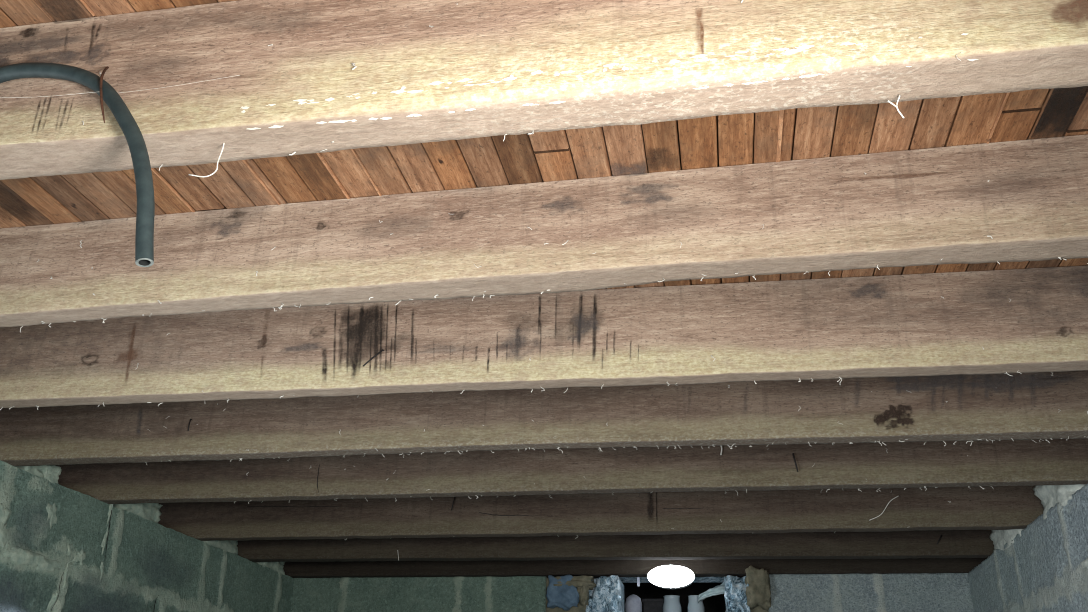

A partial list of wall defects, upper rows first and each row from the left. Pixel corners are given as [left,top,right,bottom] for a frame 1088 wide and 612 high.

damp [287,307,397,375]
damp [578,296,615,360]
damp [874,405,913,429]